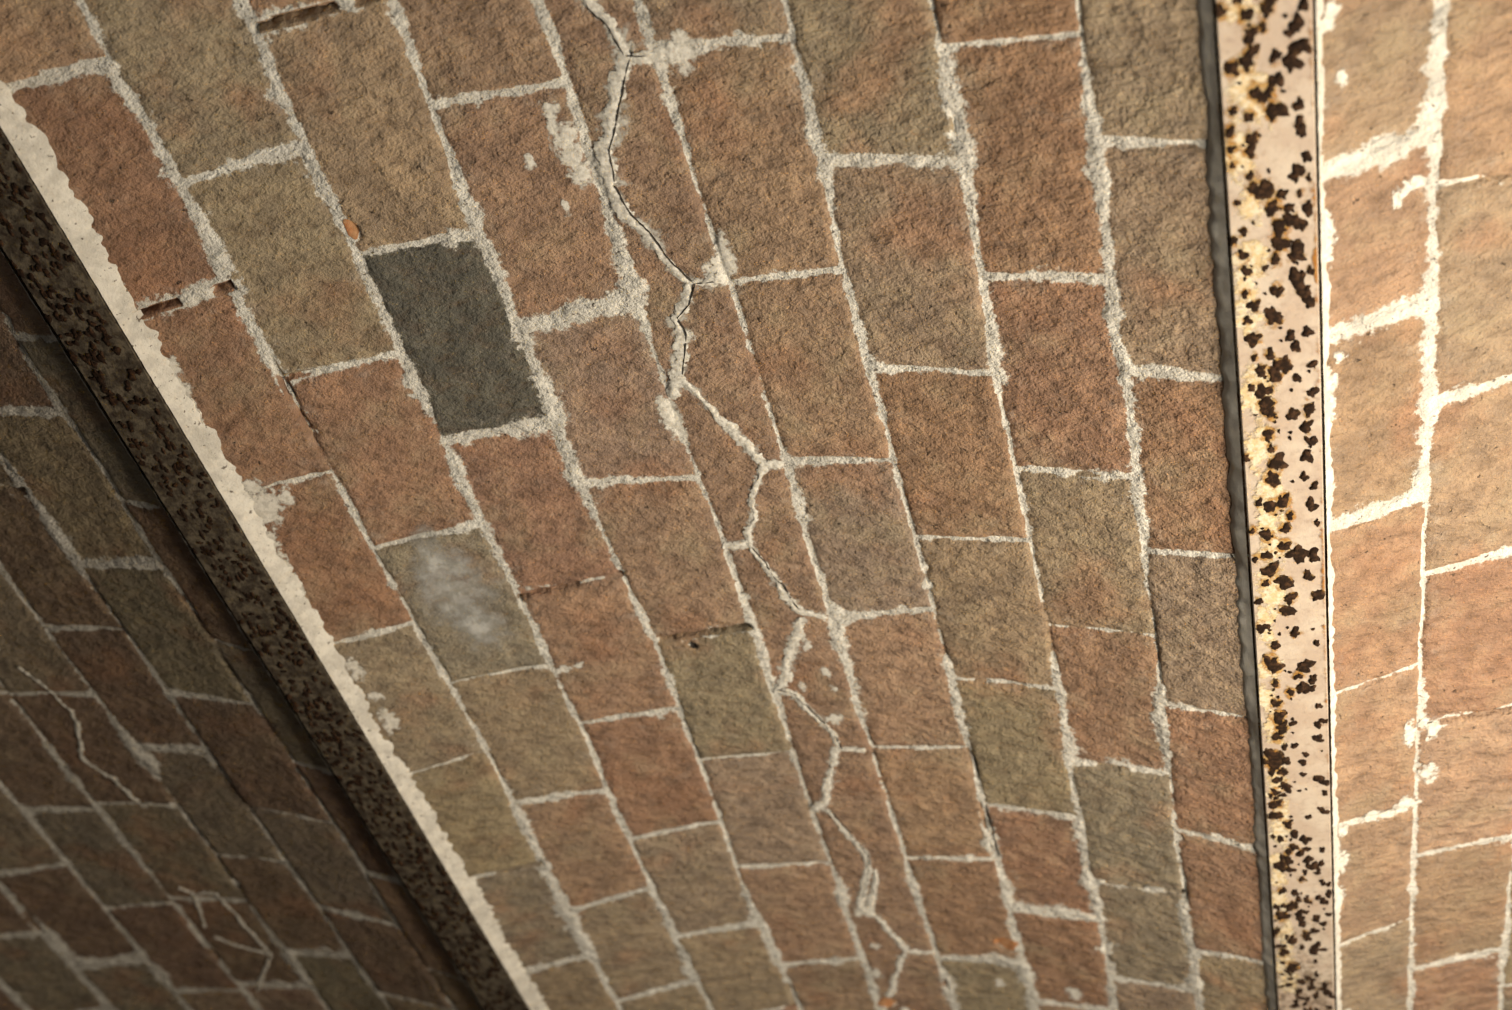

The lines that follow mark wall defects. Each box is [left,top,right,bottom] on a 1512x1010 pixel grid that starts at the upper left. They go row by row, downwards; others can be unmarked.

efflorescence [419,542,504,642]
crack [582,0,935,1010]
corrosion [1216,0,1334,1010]